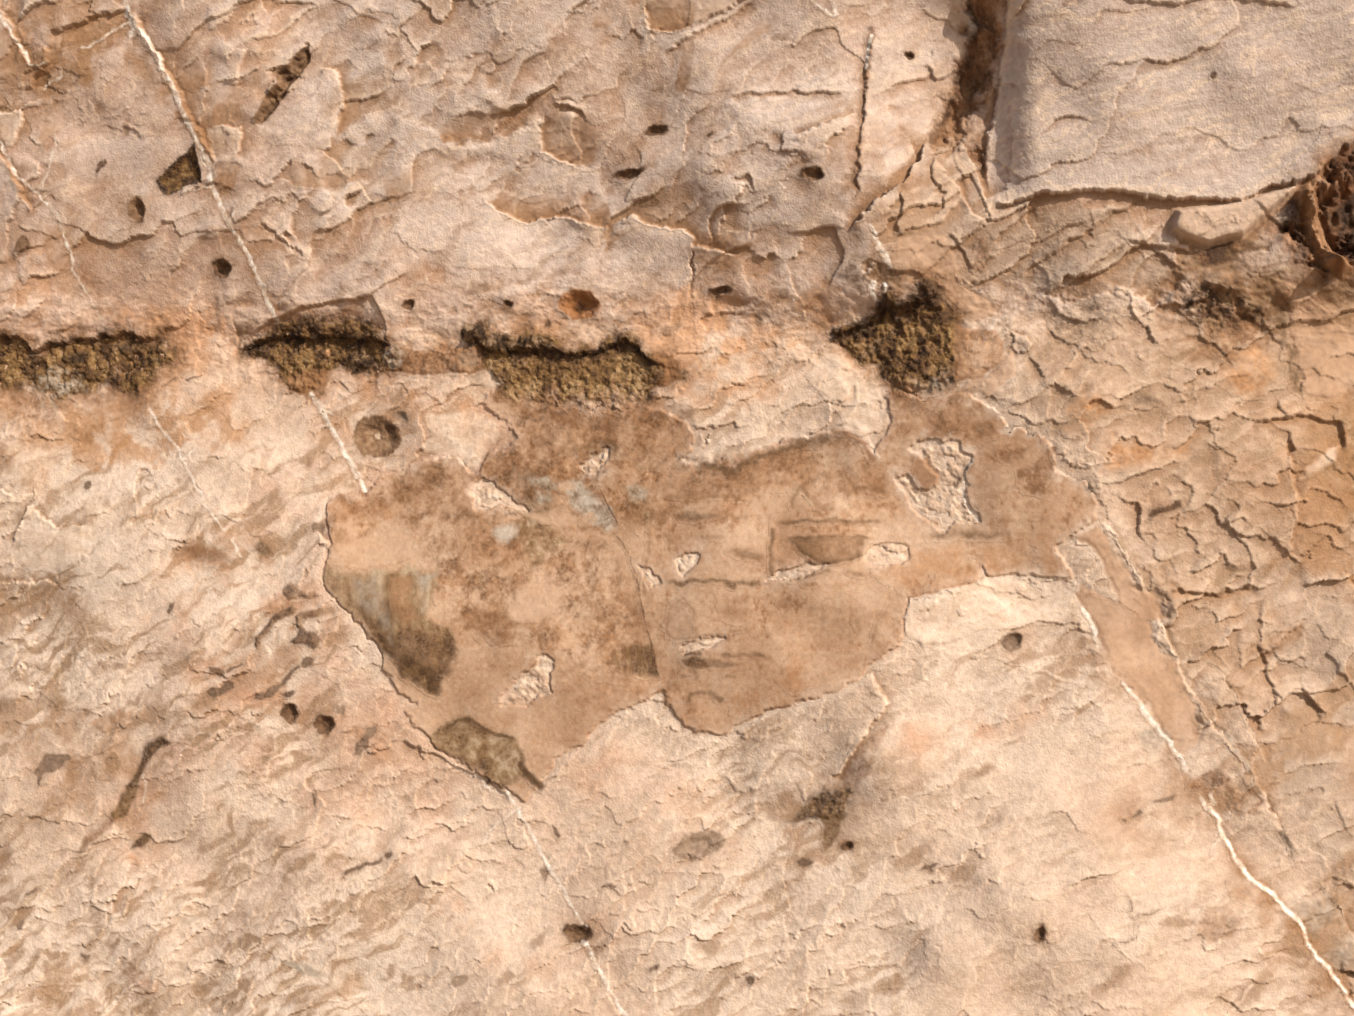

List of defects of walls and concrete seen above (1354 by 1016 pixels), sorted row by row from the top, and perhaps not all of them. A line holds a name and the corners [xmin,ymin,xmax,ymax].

crack [0,0,281,323]
leakage [0,310,199,482]
crack [147,373,243,558]
crack [308,390,369,494]
leakage [225,249,1204,700]
leakage [424,713,547,793]
leakage [714,649,812,719]
crack [901,516,1354,1010]
crack [453,763,630,1016]